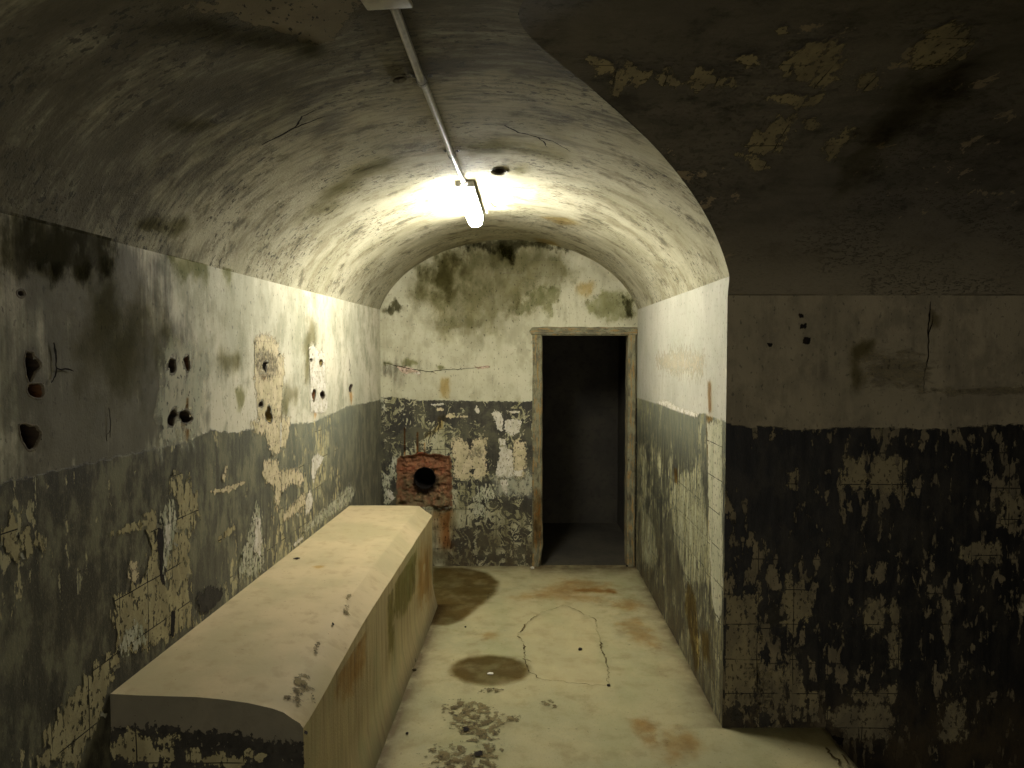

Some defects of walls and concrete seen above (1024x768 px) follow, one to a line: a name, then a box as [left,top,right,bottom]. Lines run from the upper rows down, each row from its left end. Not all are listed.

crack [262,109,324,145]
crack [504,125,569,151]
water stain [1,213,116,282]
mould [467,240,568,264]
crack [923,301,933,388]
peeling [239,334,356,584]
spalling [381,403,532,517]
peeling [36,465,267,768]
water stain [433,568,497,624]
water stain [454,656,526,682]
crack [517,605,610,685]
peeling [655,400,908,748]